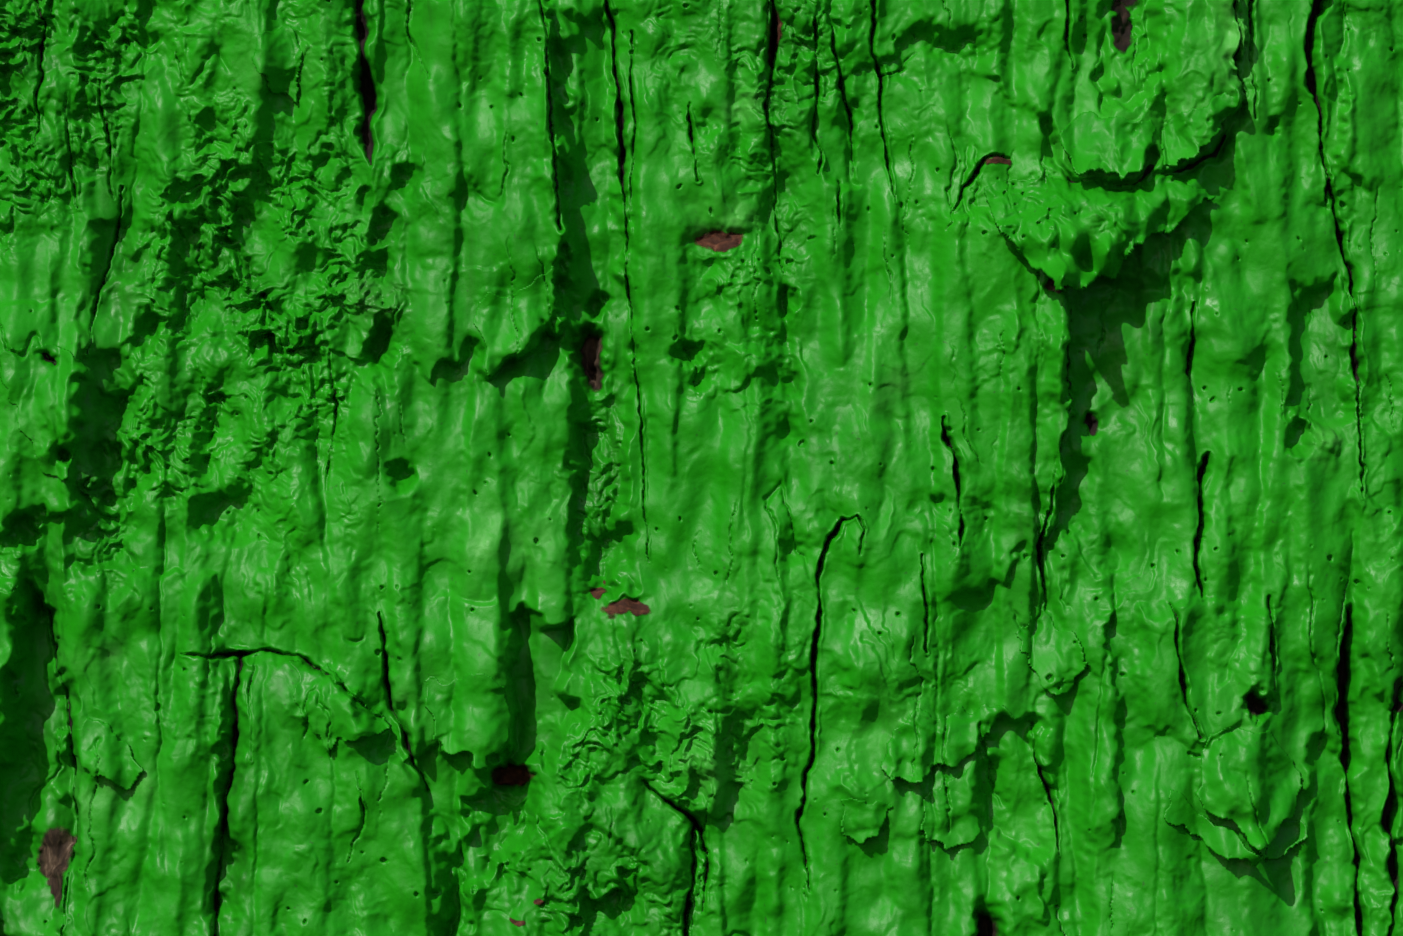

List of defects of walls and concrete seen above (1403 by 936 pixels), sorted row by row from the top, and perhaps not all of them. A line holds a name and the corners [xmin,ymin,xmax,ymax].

crack [356,0,377,165]
peeling [1111,0,1137,52]
peeling [694,230,743,252]
crack [1305,0,1364,490]
peeling [590,580,650,619]
peeling [37,827,78,907]
crack [194,649,346,936]
crack [380,619,428,790]
crack [645,782,709,936]
crack [797,519,862,886]
crack [1335,610,1401,936]